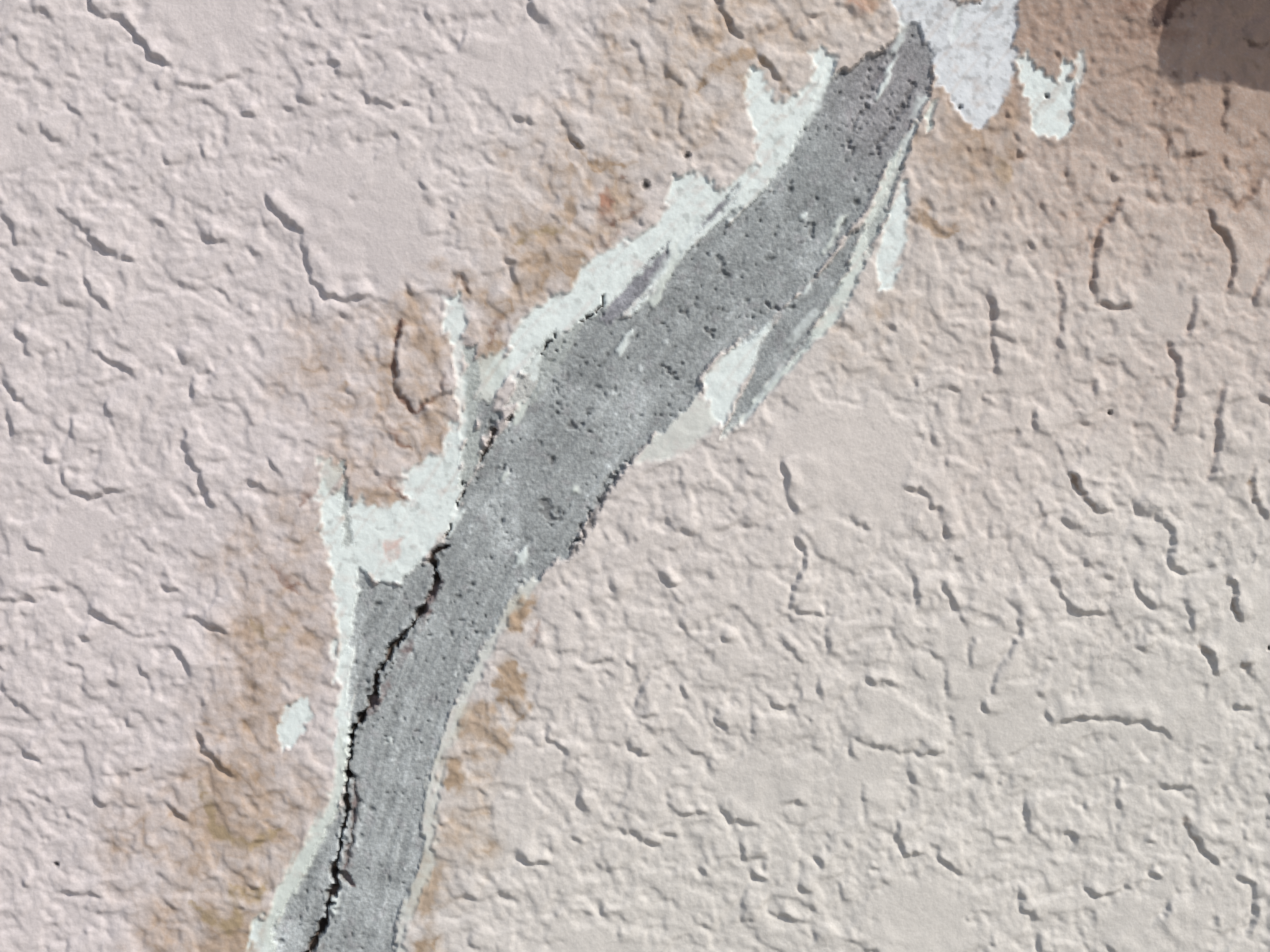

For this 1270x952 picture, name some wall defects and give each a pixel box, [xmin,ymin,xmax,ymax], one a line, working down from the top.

crack [304,409,515,952]
leakage [53,0,897,952]
crack [540,293,606,356]
spalling [244,0,1089,952]
leakage [822,0,1270,676]